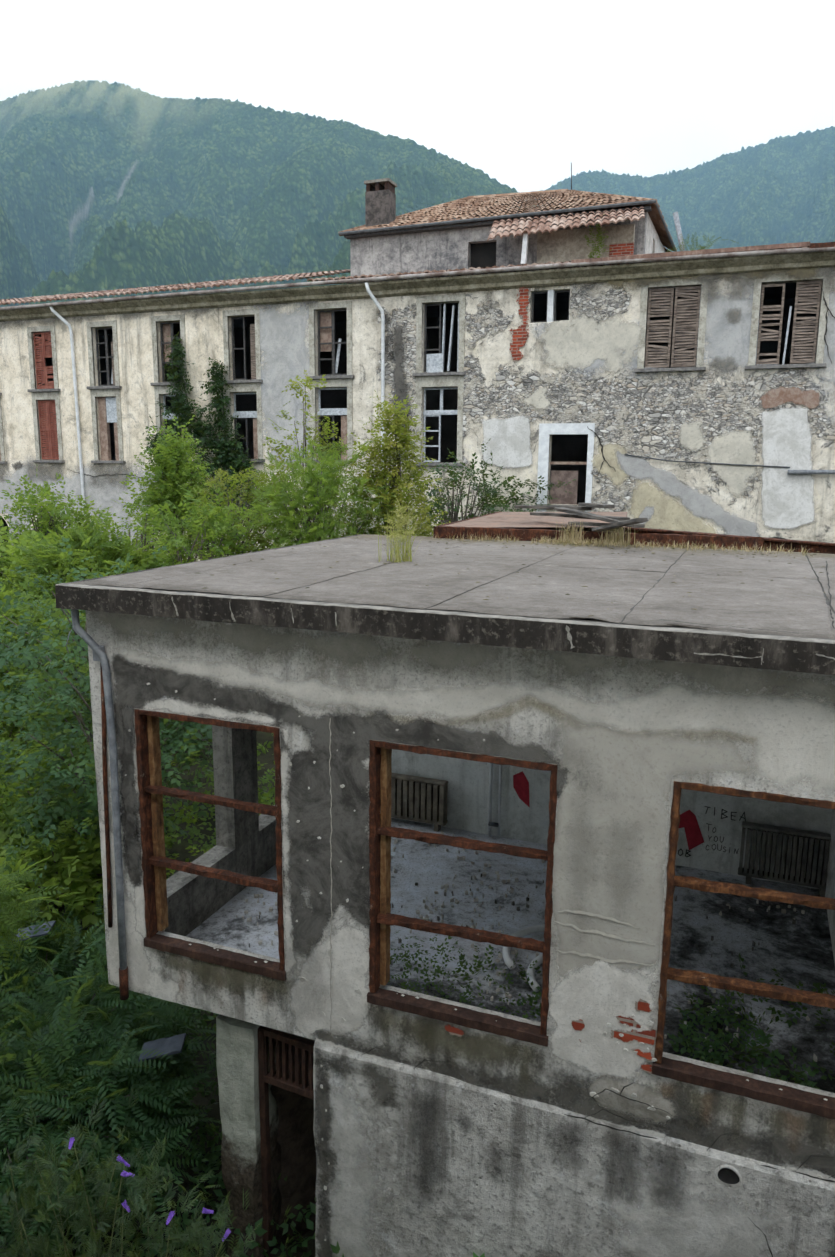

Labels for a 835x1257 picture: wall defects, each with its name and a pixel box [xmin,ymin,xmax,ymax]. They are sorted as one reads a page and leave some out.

leakage [385,315,410,430]
flaking render [508,287,645,372]
flaking render [760,387,820,409]
crack [826,561,835,629]
leakage [91,611,835,703]
leakage [112,655,570,956]
flaking render [548,959,658,1080]
leakage [415,1095,436,1198]
crack [562,1109,658,1139]
crack [761,1155,835,1182]